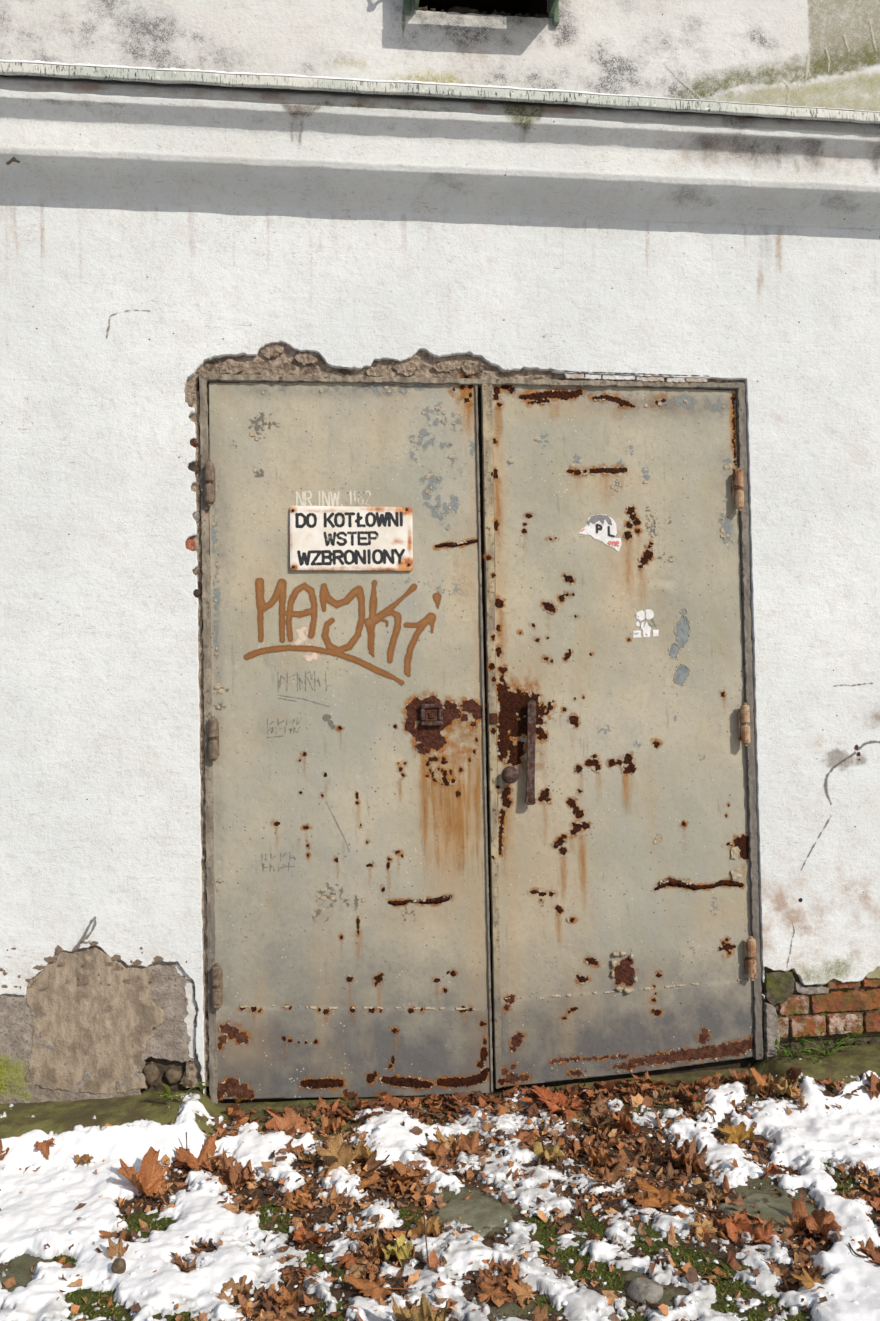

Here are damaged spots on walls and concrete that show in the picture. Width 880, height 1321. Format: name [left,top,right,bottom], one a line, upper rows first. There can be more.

rust [492,385,667,409]
rust [491,467,500,531]
rust [623,506,654,571]
spalling [0,343,744,1104]
rust [393,623,585,834]
rust [491,785,513,859]
spalling [761,966,880,1060]
rust [549,1026,754,1077]